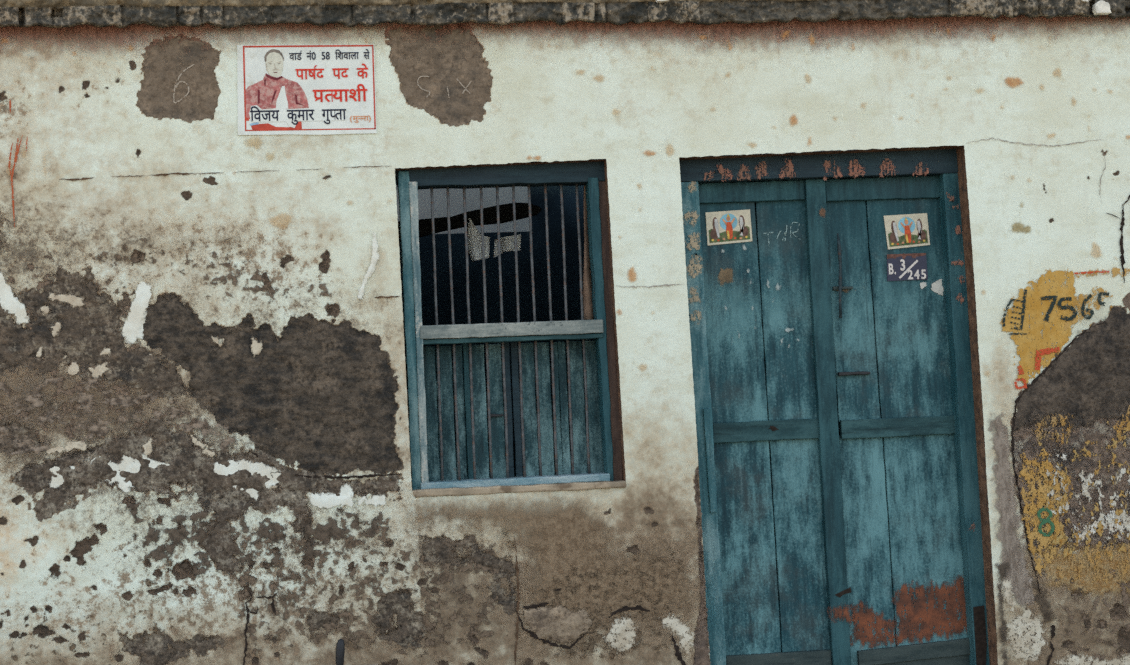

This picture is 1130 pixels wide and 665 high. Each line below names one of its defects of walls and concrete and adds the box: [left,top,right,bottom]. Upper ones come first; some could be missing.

crack [969,138,1130,283]
flaking render [0,236,521,665]
flaking render [1010,266,1130,554]
water stain [416,499,688,638]
flaking render [1055,569,1130,665]